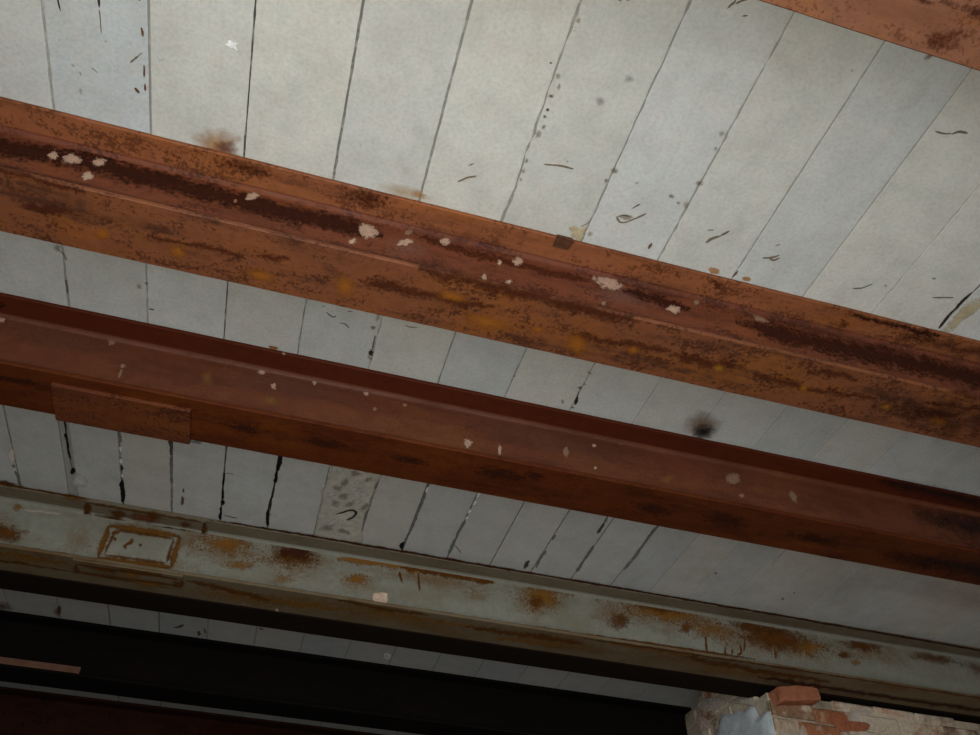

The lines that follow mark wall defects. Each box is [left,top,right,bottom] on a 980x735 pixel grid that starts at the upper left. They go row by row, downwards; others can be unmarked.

corrosion [0,138,383,237]
corrosion [422,235,589,282]
corrosion [338,267,637,322]
corrosion [623,289,690,311]
corrosion [842,314,940,336]
corrosion [564,333,740,372]
corrosion [735,319,980,418]
crack [167,456,175,484]
corrosion [0,481,980,711]
flaking render [696,697,807,735]
spalling [830,712,870,732]